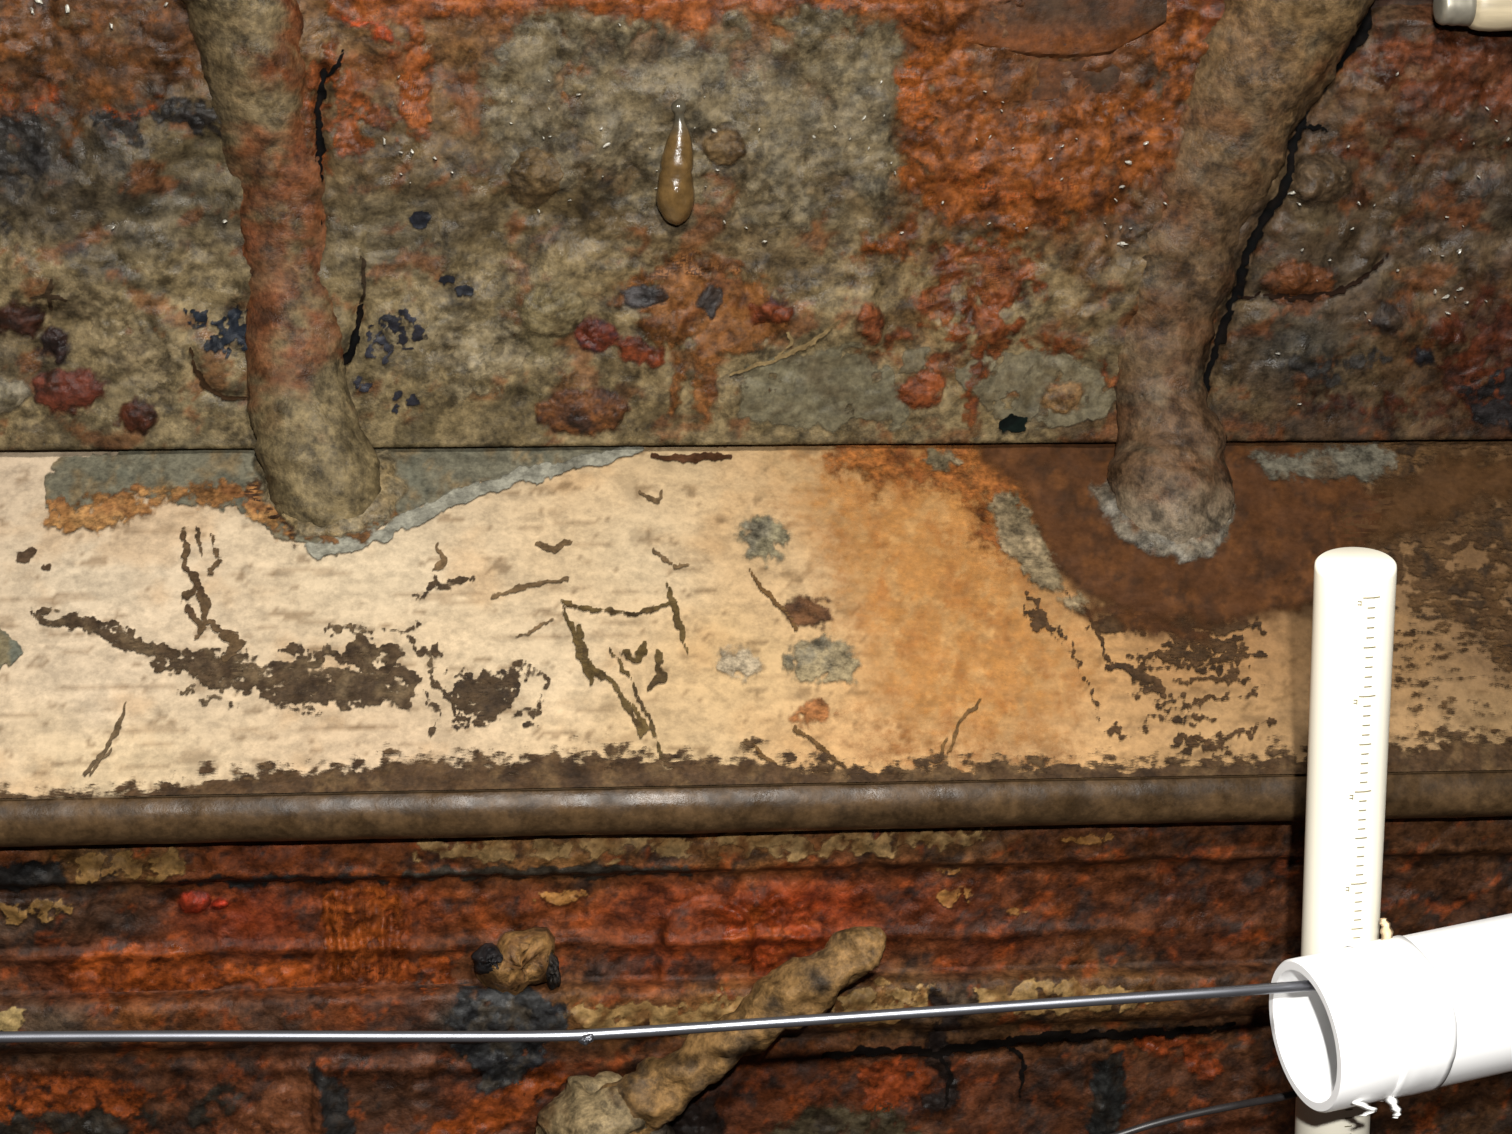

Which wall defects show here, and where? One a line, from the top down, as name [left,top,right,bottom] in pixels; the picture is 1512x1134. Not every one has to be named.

rust [0,0,201,153]
crack [314,49,344,181]
crack [1203,6,1389,391]
crack [343,256,366,365]
rust [300,0,1512,641]
peeling [44,445,752,560]
peeling [412,575,476,599]
peeling [0,607,1308,798]
leakage [781,595,861,727]
leakage [1023,590,1277,758]
peeling [1365,492,1512,772]
rust [66,885,455,998]